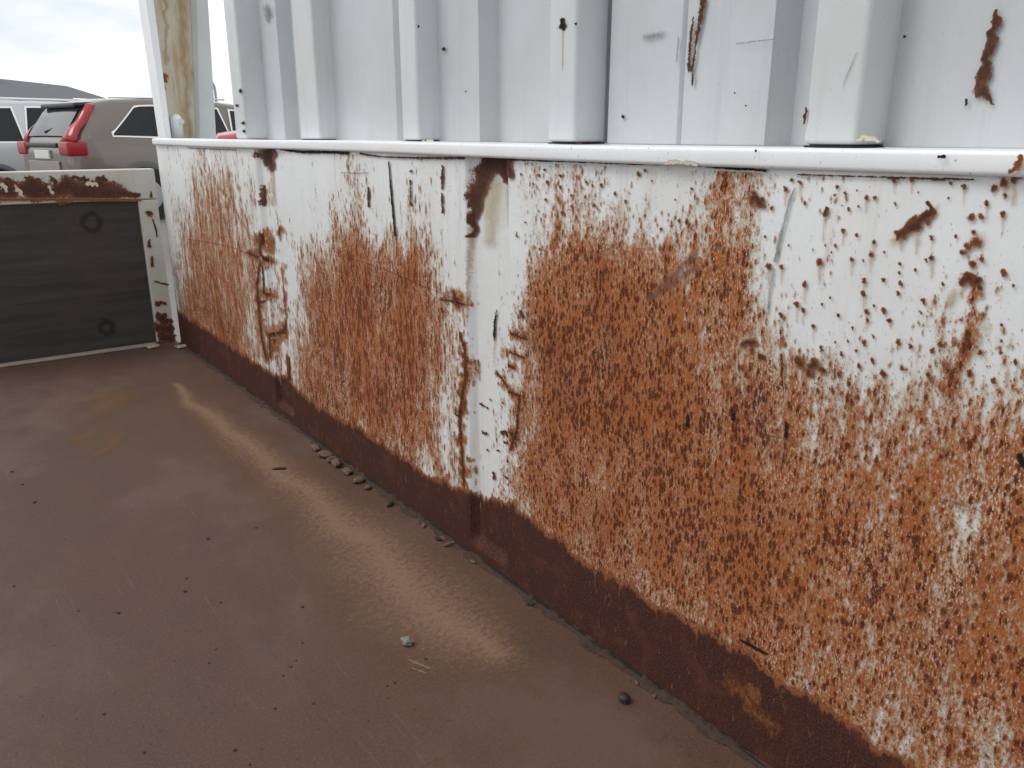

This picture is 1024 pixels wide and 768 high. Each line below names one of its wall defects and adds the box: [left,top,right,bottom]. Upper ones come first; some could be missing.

rust [965,9,1002,106]
rust [0,174,153,217]
rust [154,149,1024,768]